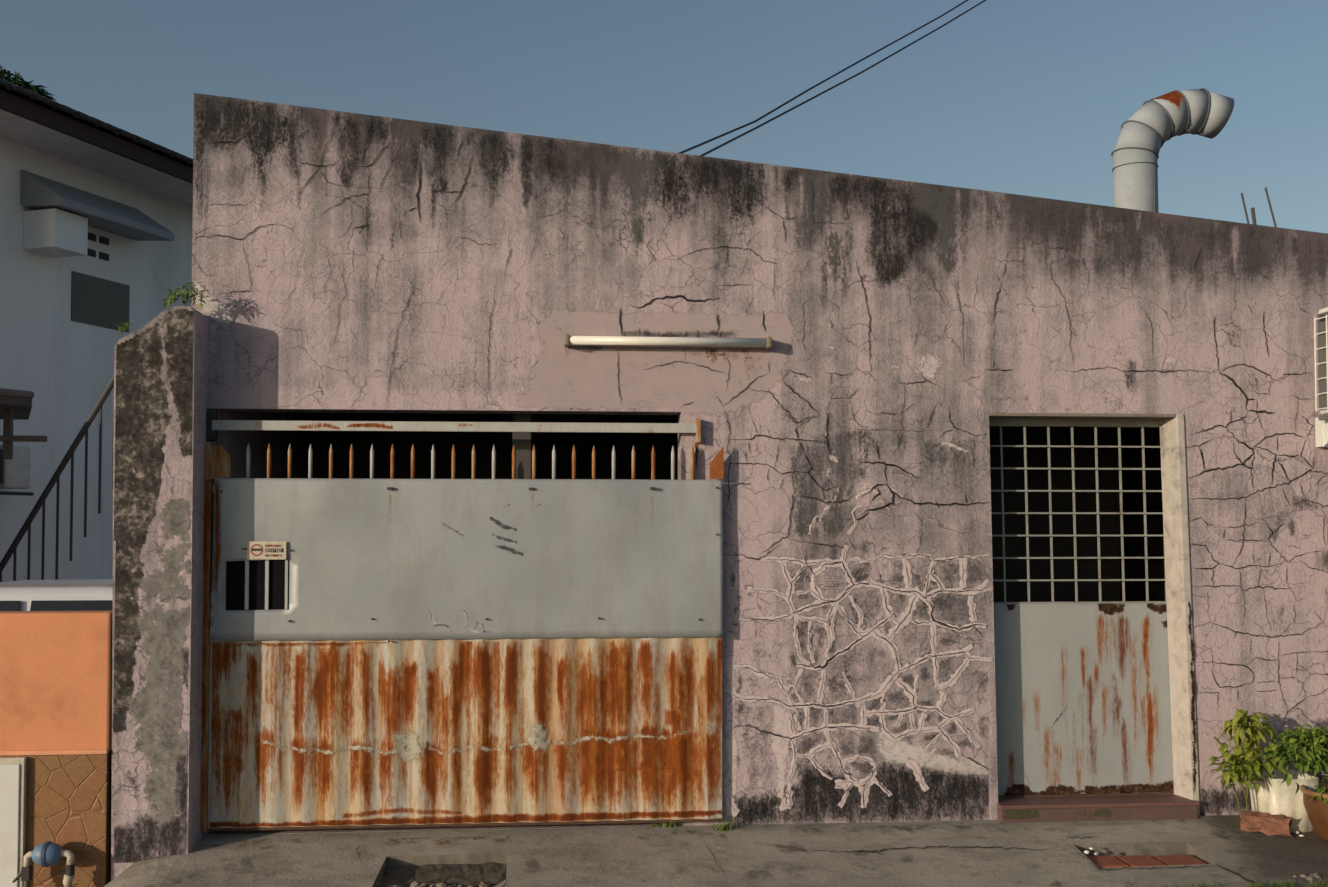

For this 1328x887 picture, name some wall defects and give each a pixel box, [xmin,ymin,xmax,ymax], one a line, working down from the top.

water stain [413,125,975,305]
rust [203,470,220,624]
crack [617,179,990,809]
crack [931,238,1328,731]
water stain [113,756,187,863]
rust [201,638,722,828]
peeling [770,703,791,812]
water stain [733,668,1039,825]
peeling [877,730,988,779]
rust [1004,755,1174,796]
rust [1081,603,1167,768]
rust [1188,602,1197,793]